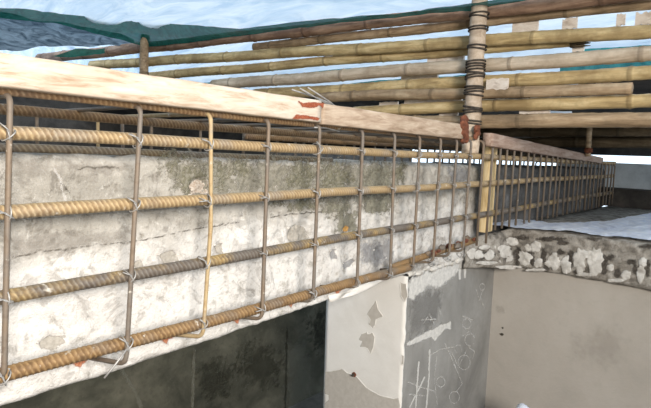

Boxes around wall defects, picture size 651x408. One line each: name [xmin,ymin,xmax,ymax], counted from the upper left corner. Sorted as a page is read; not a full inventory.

spalling [400,235,651,302]
water stain [308,312,325,350]
peeling [359,301,383,354]
peeling [325,369,400,408]